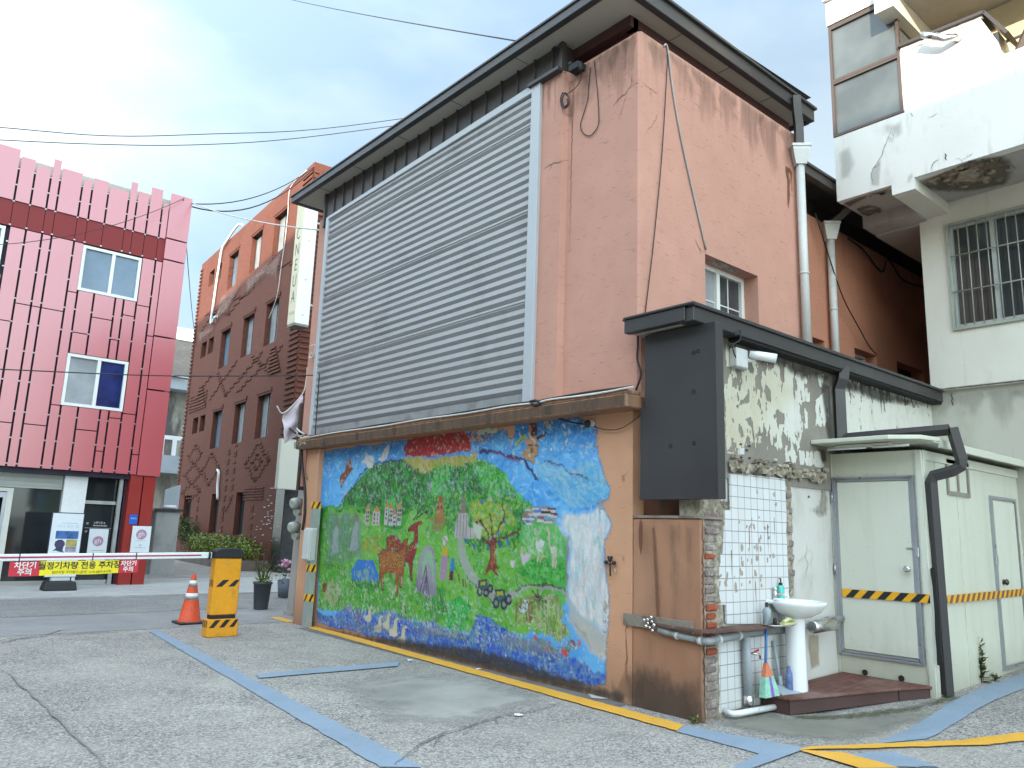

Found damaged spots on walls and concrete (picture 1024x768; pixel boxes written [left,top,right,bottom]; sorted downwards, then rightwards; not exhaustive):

spalling [922,157,1015,188]
peeling [724,344,827,468]
peeling [845,379,933,433]
flaking render [679,481,795,721]
leakage [365,637,694,719]